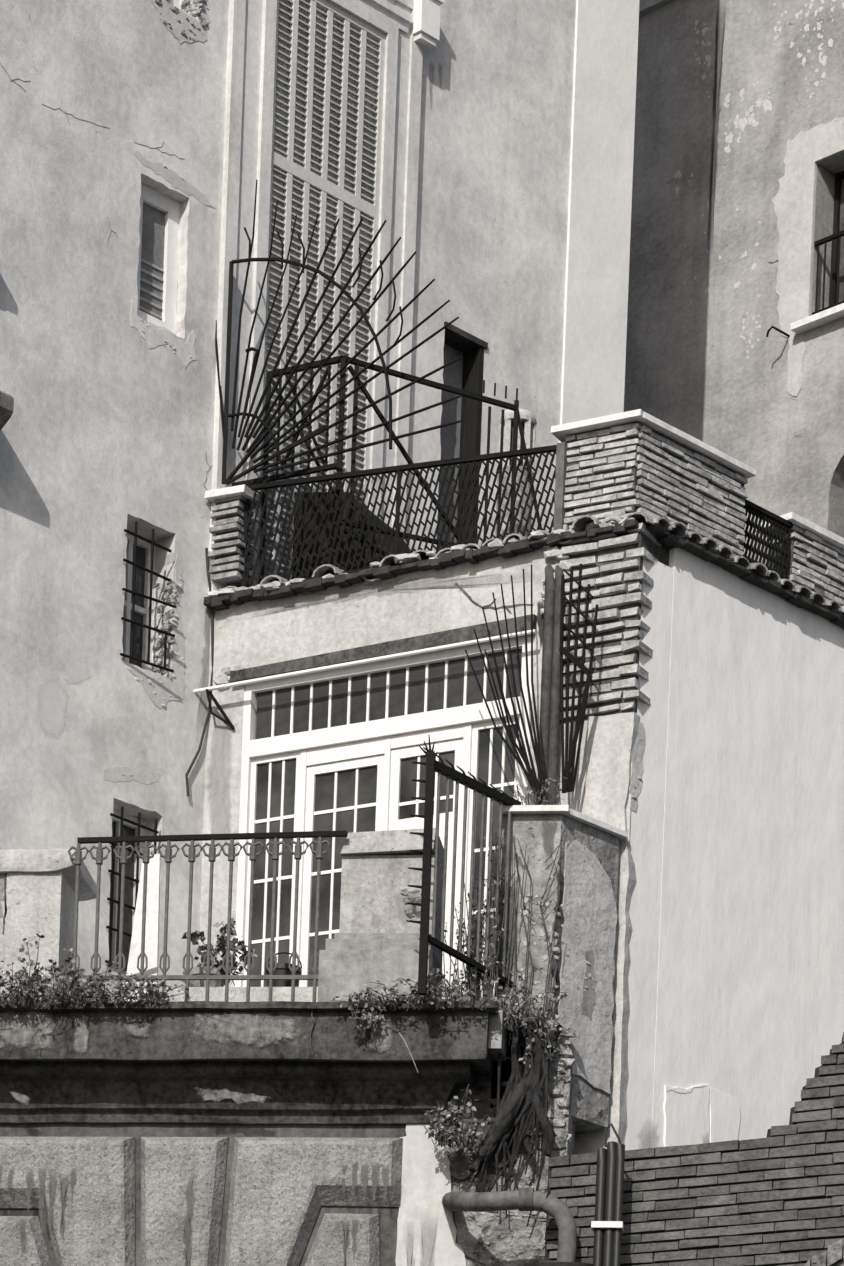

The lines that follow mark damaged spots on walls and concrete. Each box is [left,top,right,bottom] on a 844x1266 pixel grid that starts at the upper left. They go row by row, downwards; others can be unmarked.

spalling [151,0,210,44]
peeling [773,0,844,99]
crack [0,63,108,128]
damp [709,18,724,226]
peeling [723,82,772,153]
spalling [127,553,185,709]
flaking render [212,664,245,685]
damp [0,1011,53,1049]
damp [75,1016,88,1052]
damp [194,1012,294,1047]
damp [11,1092,29,1103]
damp [201,1088,265,1103]